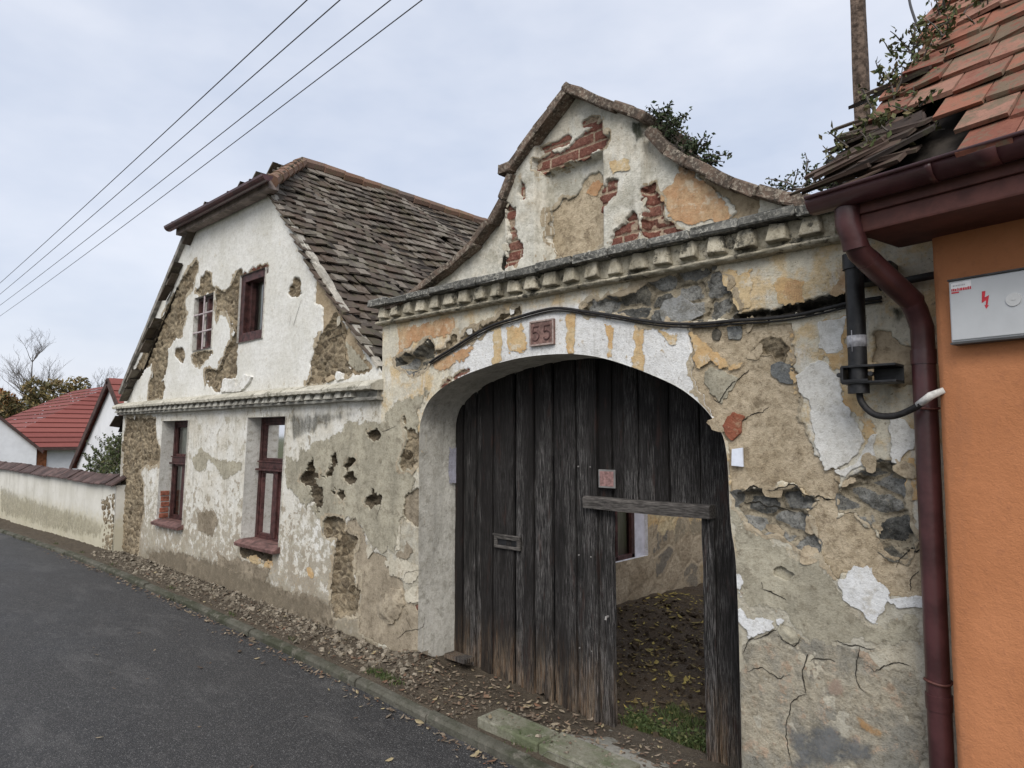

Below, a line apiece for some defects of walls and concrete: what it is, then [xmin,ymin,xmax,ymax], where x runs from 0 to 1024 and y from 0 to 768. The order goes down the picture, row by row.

spalling [501,183,526,270]
spalling [529,115,760,259]
spalling [134,257,269,401]
spalling [303,281,372,386]
peeling [99,303,527,652]
peeling [565,266,928,768]
crack [743,630,910,767]